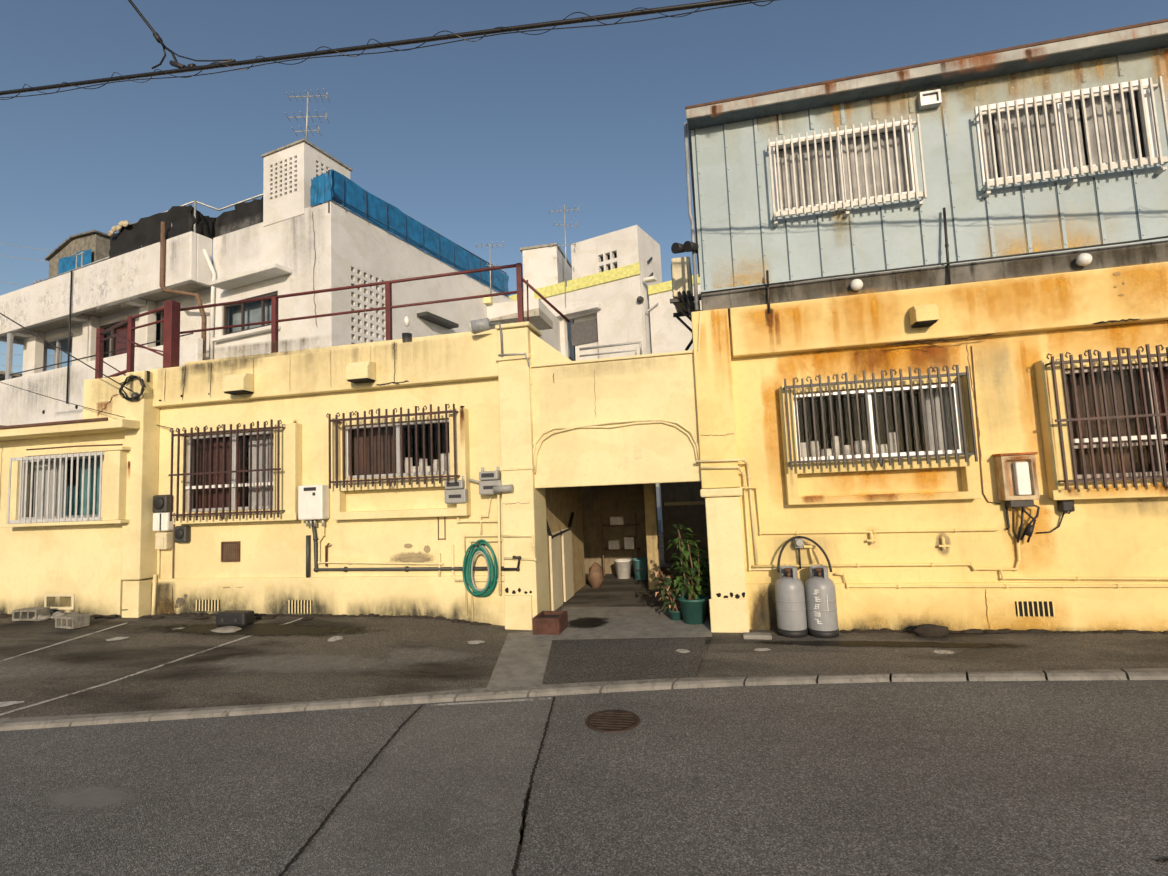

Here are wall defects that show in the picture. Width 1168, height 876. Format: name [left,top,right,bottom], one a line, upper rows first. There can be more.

rust [941,54,994,92]
rust [1006,49,1049,84]
rust [751,309,798,331]
rust [1105,323,1139,341]
leakage [151,584,240,614]
leakage [269,597,329,615]
leakage [1009,616,1057,631]